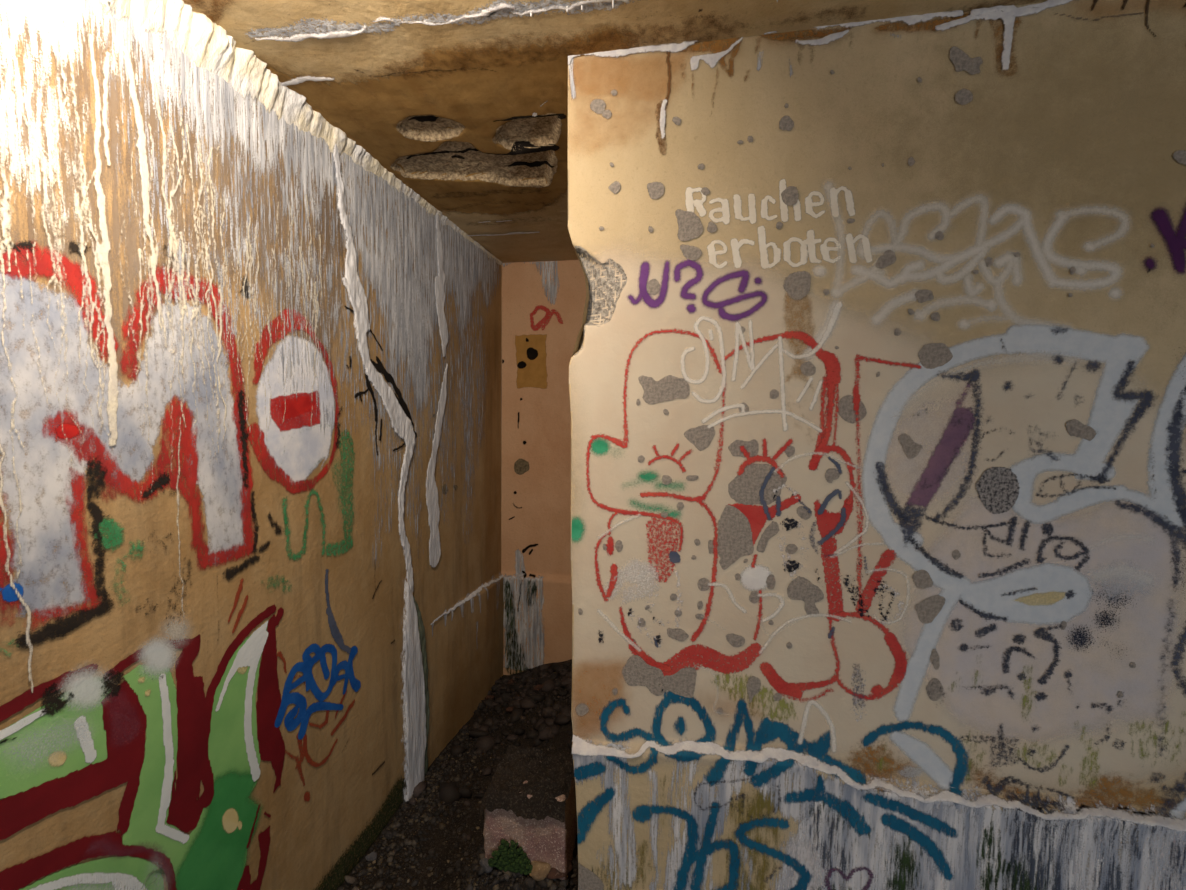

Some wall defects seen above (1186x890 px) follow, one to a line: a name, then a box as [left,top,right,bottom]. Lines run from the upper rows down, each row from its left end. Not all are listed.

crack [281,68,492,86]
crack [245,0,634,42]
crack [568,40,698,65]
spalling [390,102,566,188]
spalling [574,246,627,356]
damp [0,0,744,775]
crack [345,306,417,455]
peeling [502,334,548,427]
damp [572,735,1186,890]